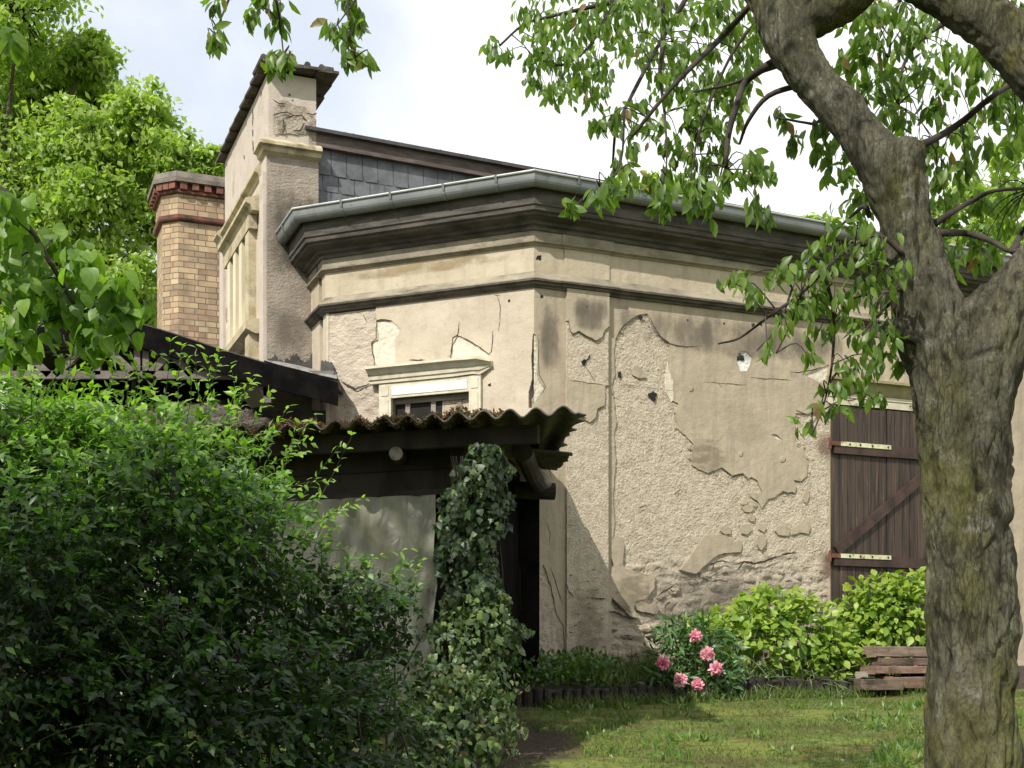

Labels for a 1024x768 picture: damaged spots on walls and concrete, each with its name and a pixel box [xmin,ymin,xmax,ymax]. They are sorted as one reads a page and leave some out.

flaking render [273,93,317,135]
flaking render [329,309,400,425]
leakage [576,306,599,328]
flaking render [539,314,830,672]